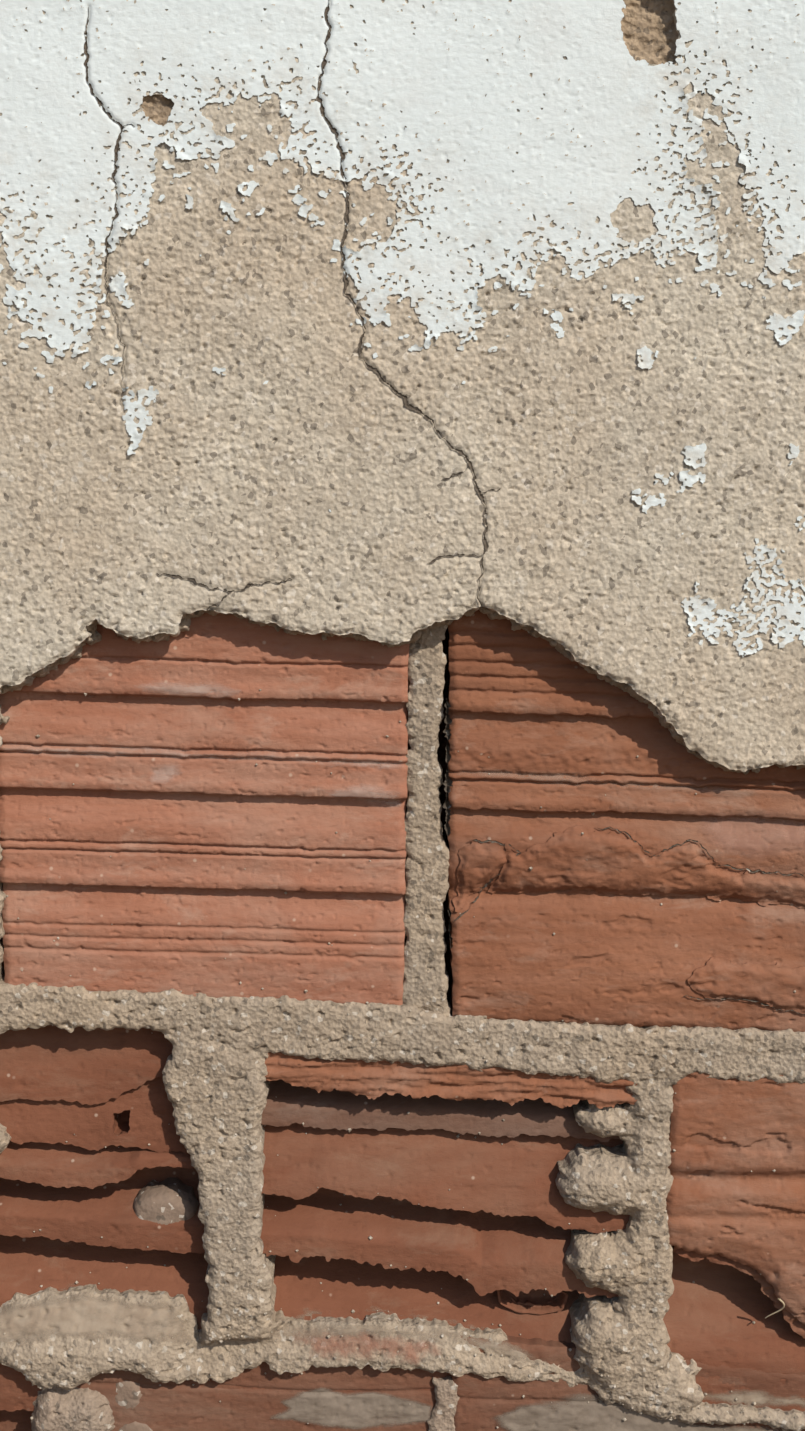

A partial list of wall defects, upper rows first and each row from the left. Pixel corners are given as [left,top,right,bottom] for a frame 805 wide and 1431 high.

crack [84,7,135,398]
peeling [0,0,805,389]
crack [315,6,500,610]
peeling [122,386,159,455]
peeling [632,443,707,514]
crack [157,573,292,610]
peeling [681,538,805,657]
flaking render [0,607,805,775]
crack [443,698,521,949]
spalling [452,825,805,912]
spalling [687,957,805,1014]
spalling [672,1246,805,1339]